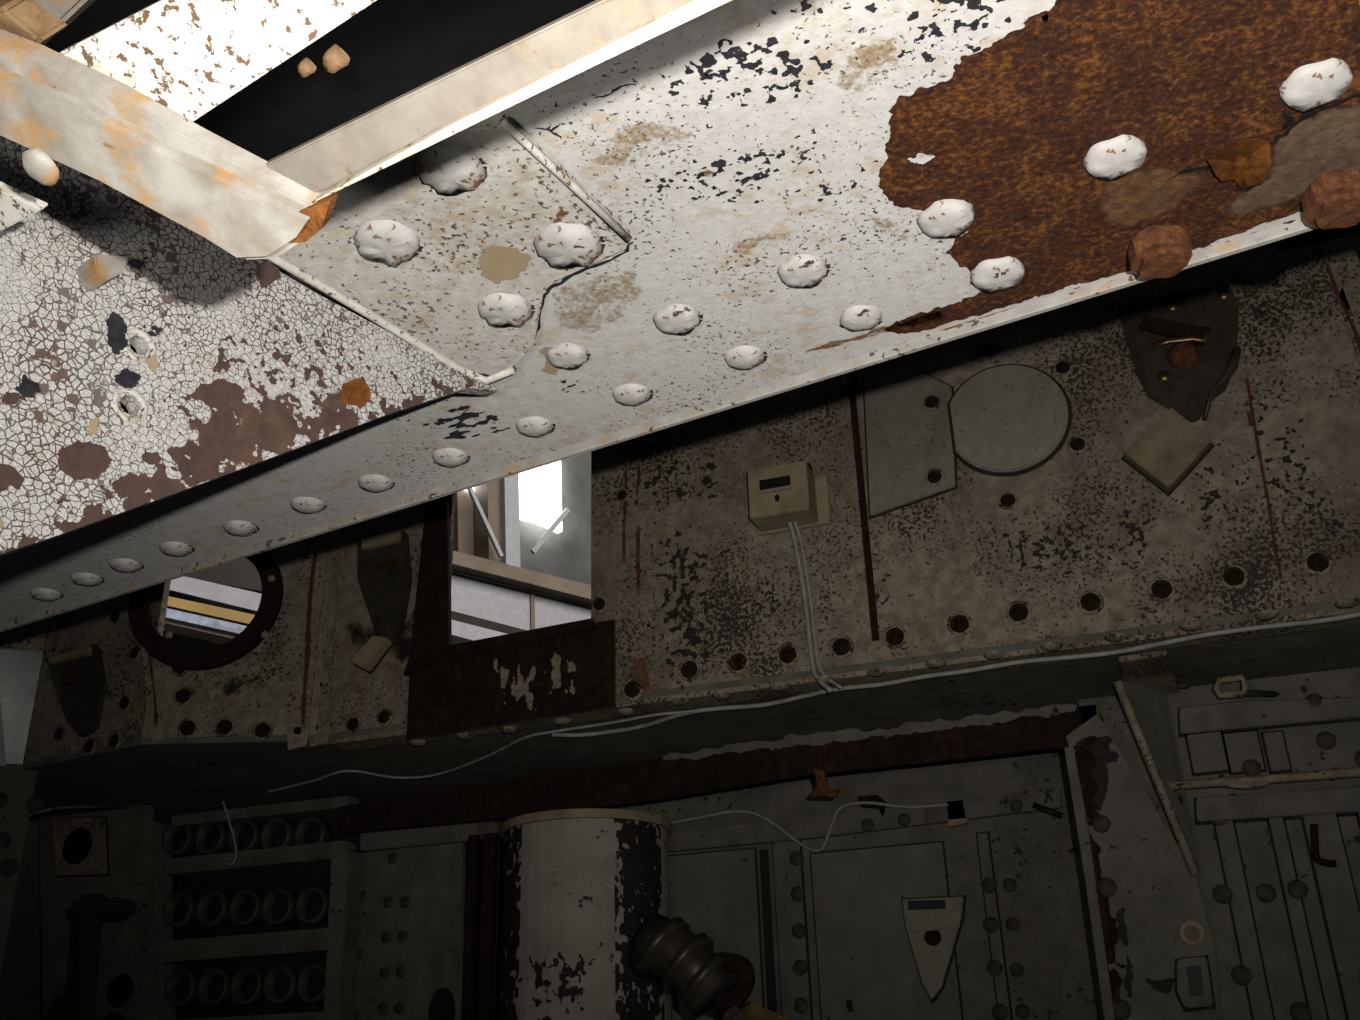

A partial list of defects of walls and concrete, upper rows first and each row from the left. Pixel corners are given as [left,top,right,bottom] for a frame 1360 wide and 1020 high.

peeling [638,0,832,111]
peeling [897,0,1011,62]
peeling [645,126,881,211]
corrosion [808,0,1360,353]
crack [534,242,633,345]
corrosion [1,392,27,404]
corrosion [0,464,24,493]
corrosion [54,378,474,533]
corrosion [0,533,38,554]
peeling [493,658,510,704]
peeling [550,659,576,694]
peeling [614,819,665,1020]